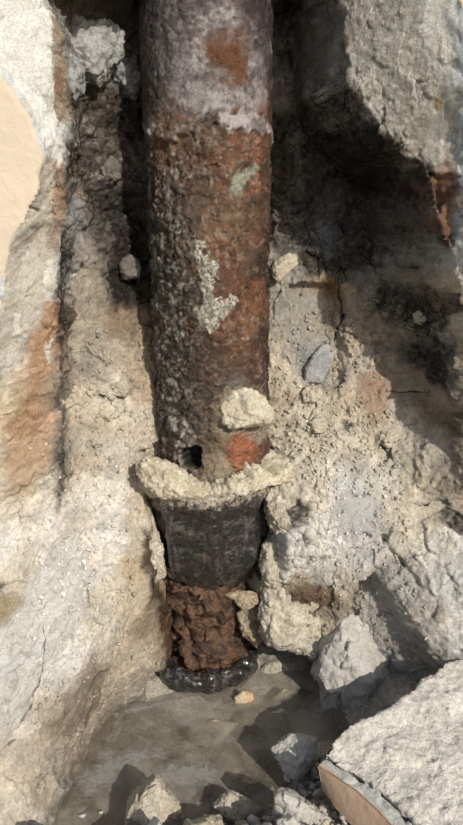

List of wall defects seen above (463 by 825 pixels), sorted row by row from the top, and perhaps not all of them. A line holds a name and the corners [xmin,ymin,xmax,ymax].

spalling [0,164,60,391]
flaking render [0,0,75,153]
water stain [55,84,151,387]
water stain [270,89,434,272]
spalling [350,0,463,267]
water stain [375,283,460,391]
water stain [54,399,72,505]
rust [227,431,257,473]
flaking render [0,534,95,734]
spalling [408,541,463,627]
spalling [435,526,461,544]